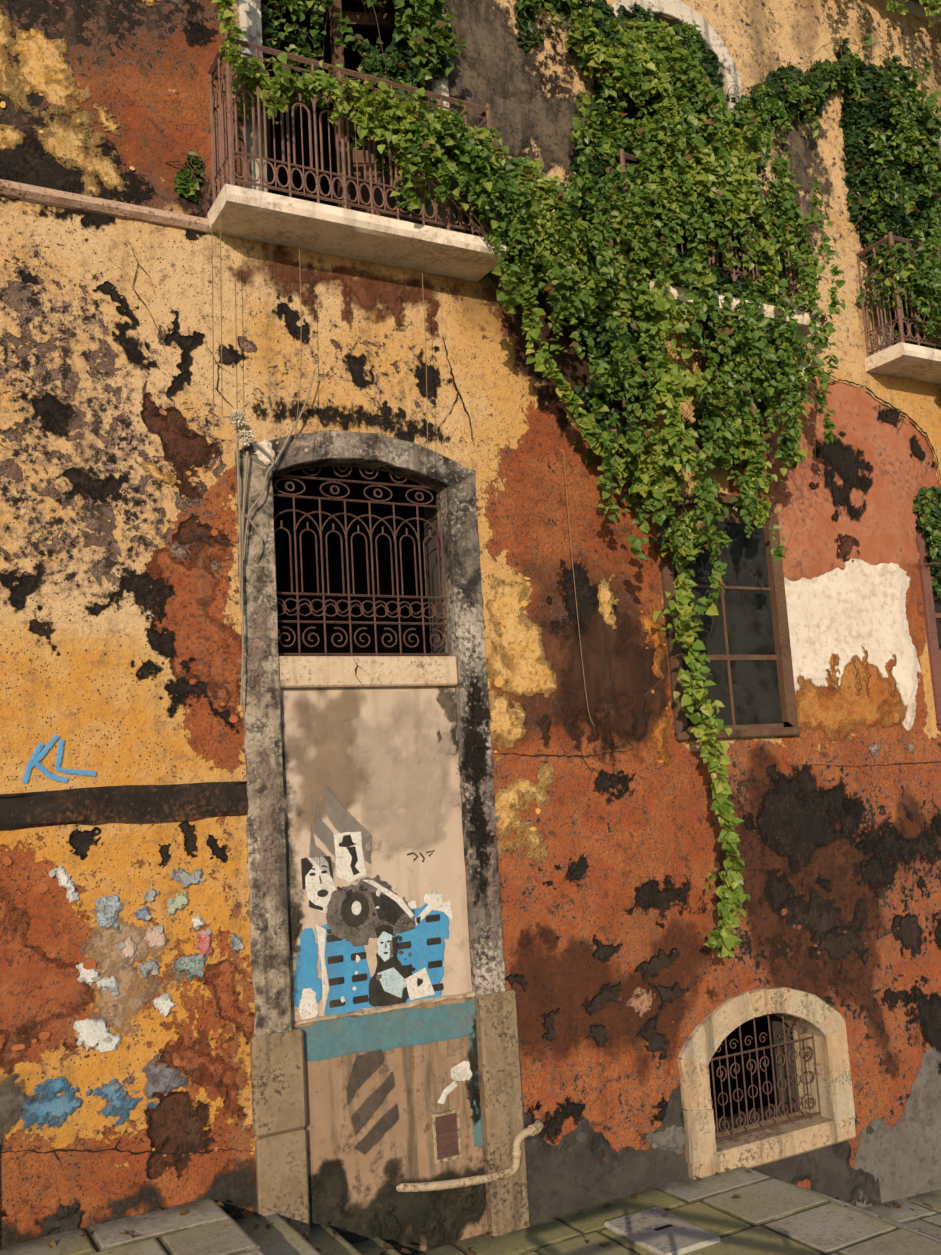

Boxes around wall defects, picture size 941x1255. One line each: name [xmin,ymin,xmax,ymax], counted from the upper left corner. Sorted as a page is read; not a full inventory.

water stain [0,198,115,232]
peeling [0,7,135,197]
water stain [0,117,168,205]
water stain [112,309,157,371]
water stain [62,465,137,505]
water stain [0,550,60,656]
water stain [85,567,240,733]
peeling [480,543,557,944]
water stain [537,559,668,805]
corrosion [796,646,907,741]
peeling [784,534,922,731]
water stain [511,749,941,1077]